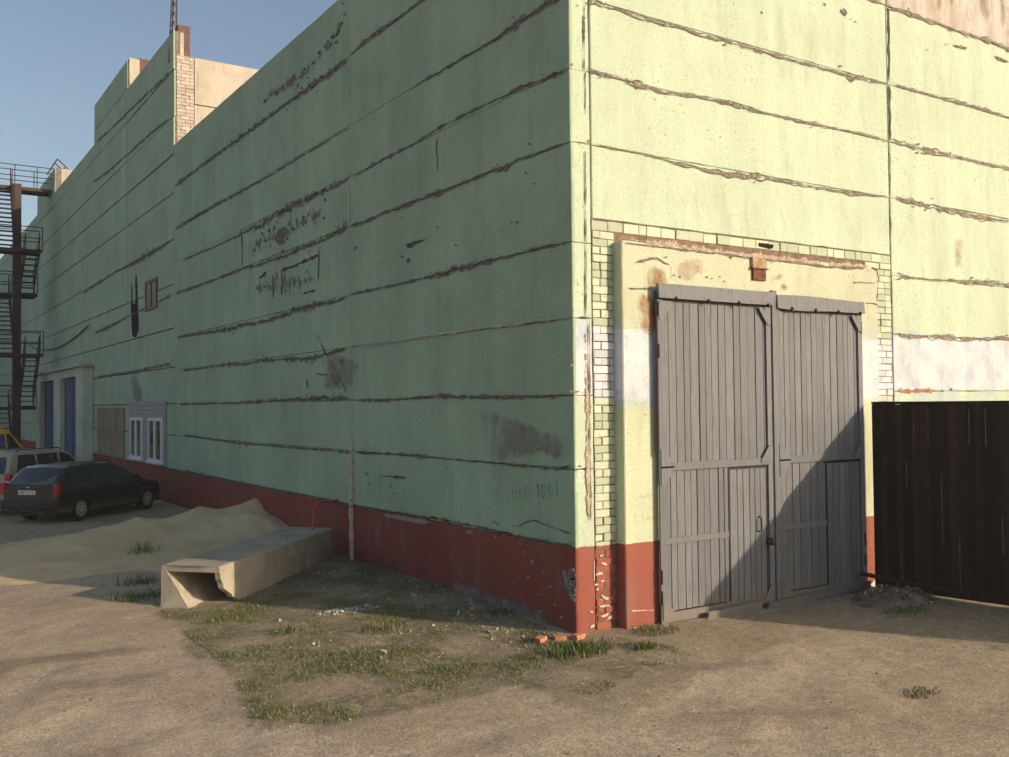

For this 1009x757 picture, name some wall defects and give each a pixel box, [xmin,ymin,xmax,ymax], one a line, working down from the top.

crack [886,9,894,248]
peeling [250,199,326,259]
rust [641,297,655,331]